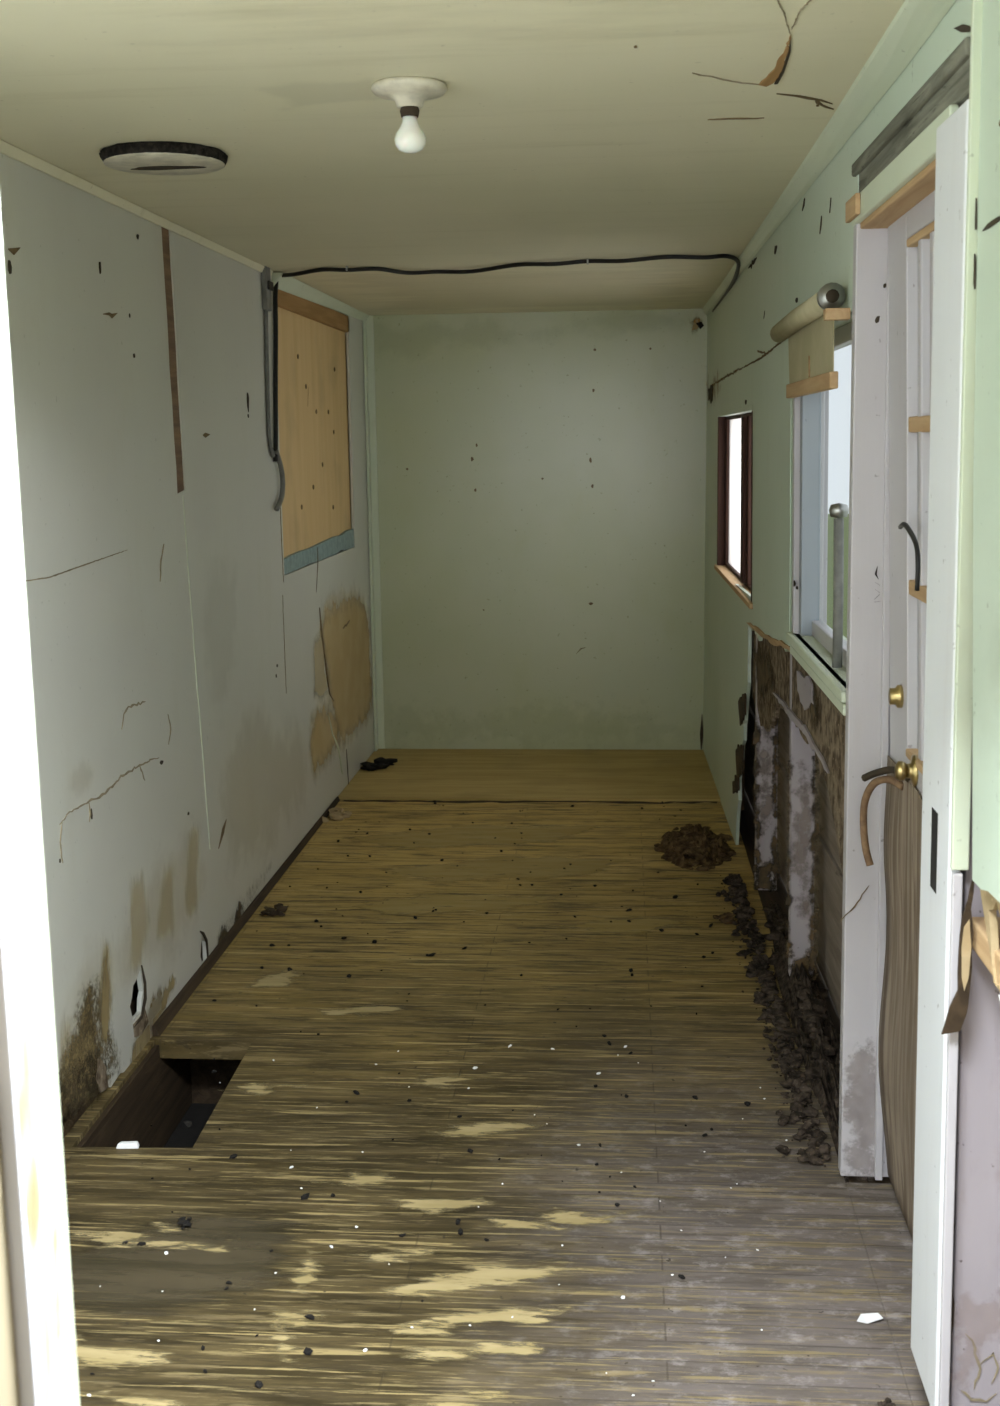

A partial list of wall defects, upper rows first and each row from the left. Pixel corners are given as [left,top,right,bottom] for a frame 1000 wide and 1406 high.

crack [708,93,834,120]
crack [24,550,127,582]
crack [59,498,227,863]
peeling [310,597,372,774]
peeling [738,693,747,726]
peeling [732,744,744,794]
damp [218,879,265,944]
damp [58,951,175,1133]
peeling [951,1287,999,1402]